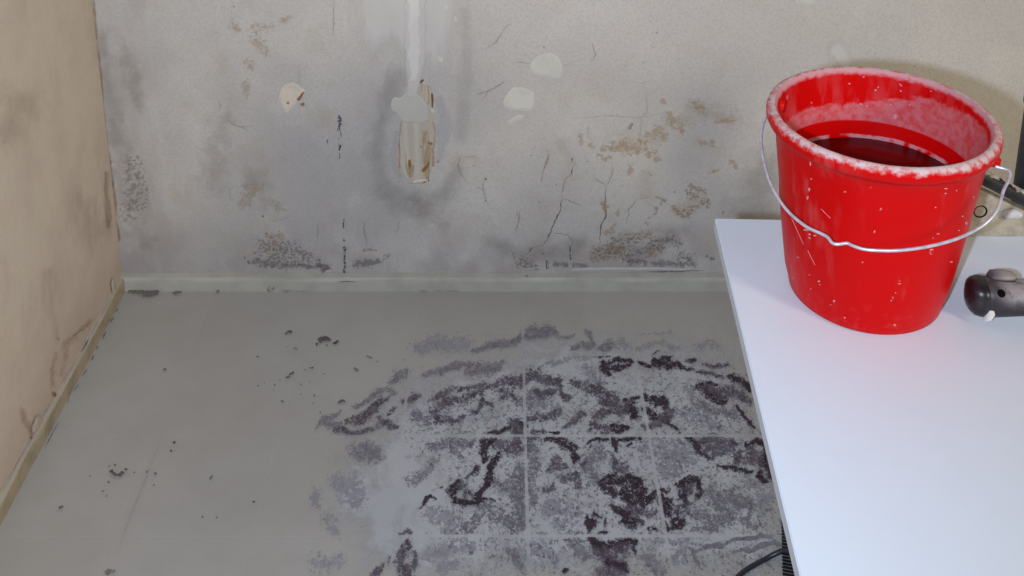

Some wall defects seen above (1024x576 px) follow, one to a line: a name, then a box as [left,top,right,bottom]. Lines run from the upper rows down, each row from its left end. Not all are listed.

spalling [359,0,457,184]
crack [509,80,668,261]